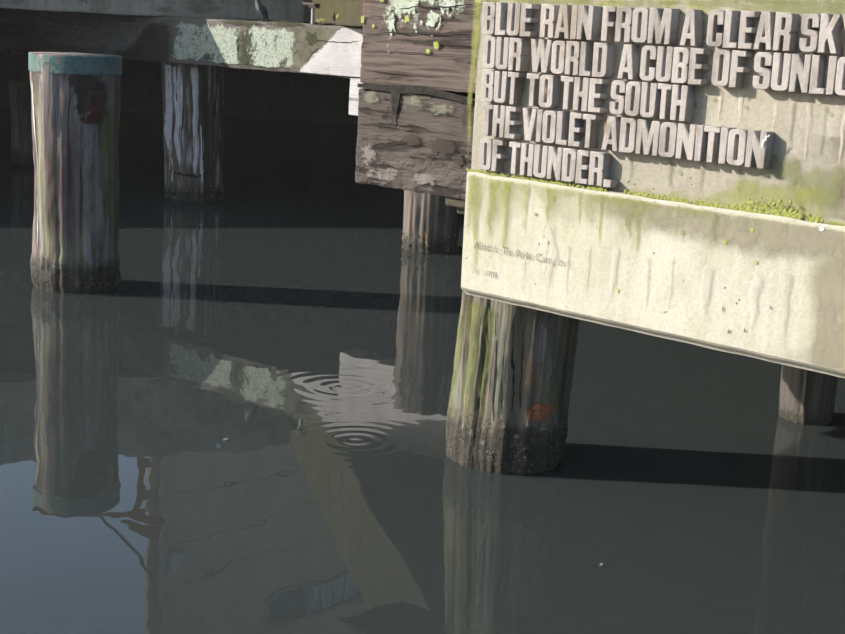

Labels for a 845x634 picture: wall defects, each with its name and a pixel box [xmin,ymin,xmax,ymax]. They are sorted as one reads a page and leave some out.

leakage [607,199,845,370]